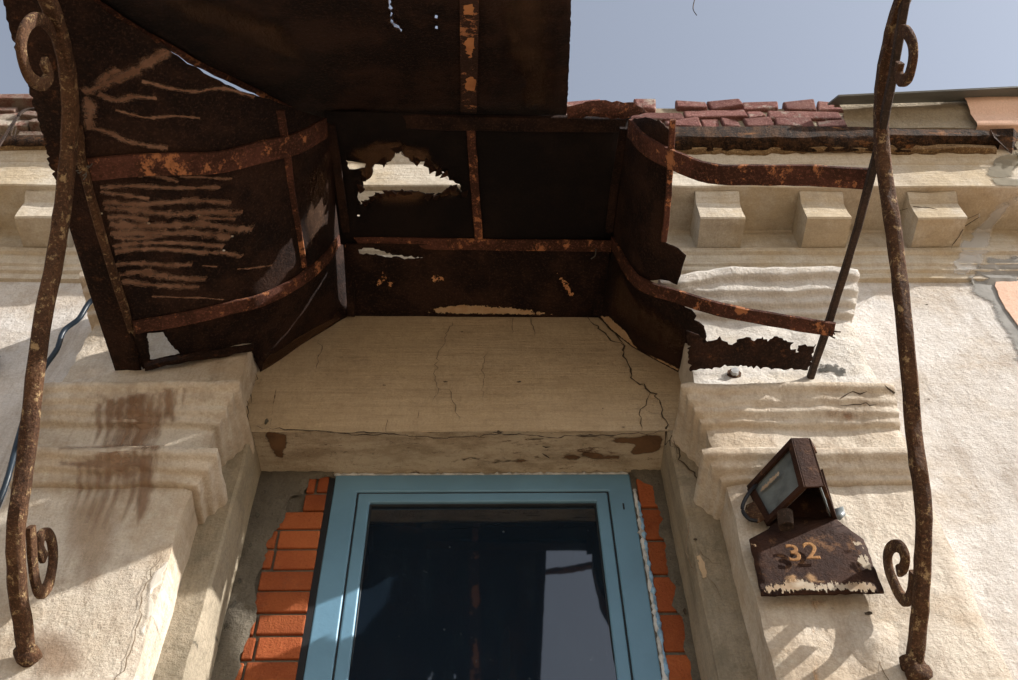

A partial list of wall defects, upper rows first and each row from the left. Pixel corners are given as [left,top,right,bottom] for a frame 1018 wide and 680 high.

rust [81,48,256,150]
rust [356,143,457,206]
rust [100,175,272,300]
rust [71,389,173,518]
rust [263,314,340,370]
crack [247,317,697,478]